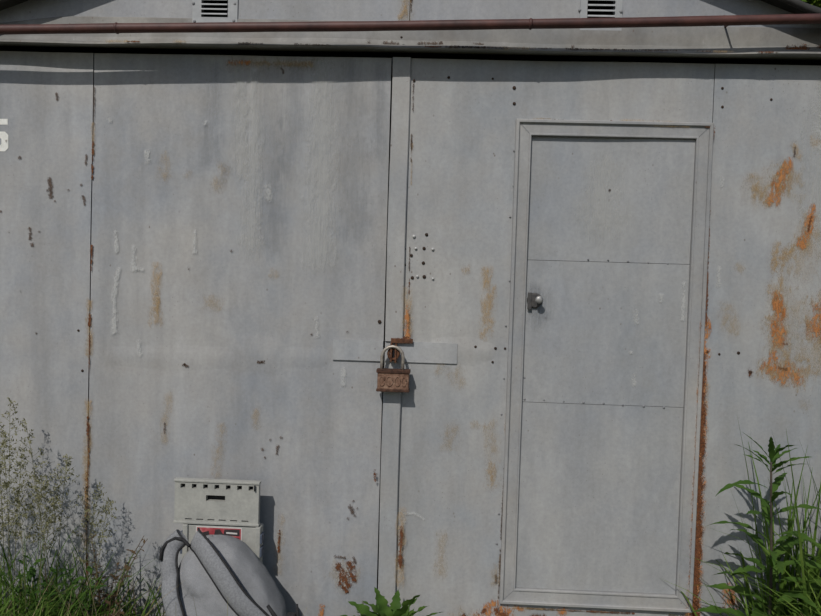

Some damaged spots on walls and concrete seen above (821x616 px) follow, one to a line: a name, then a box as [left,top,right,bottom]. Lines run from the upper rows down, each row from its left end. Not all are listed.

rust [754,145,798,205]
rust [774,205,816,265]
rust [749,283,803,385]
rust [668,228,711,616]
rust [334,555,357,593]
rust [462,550,635,616]